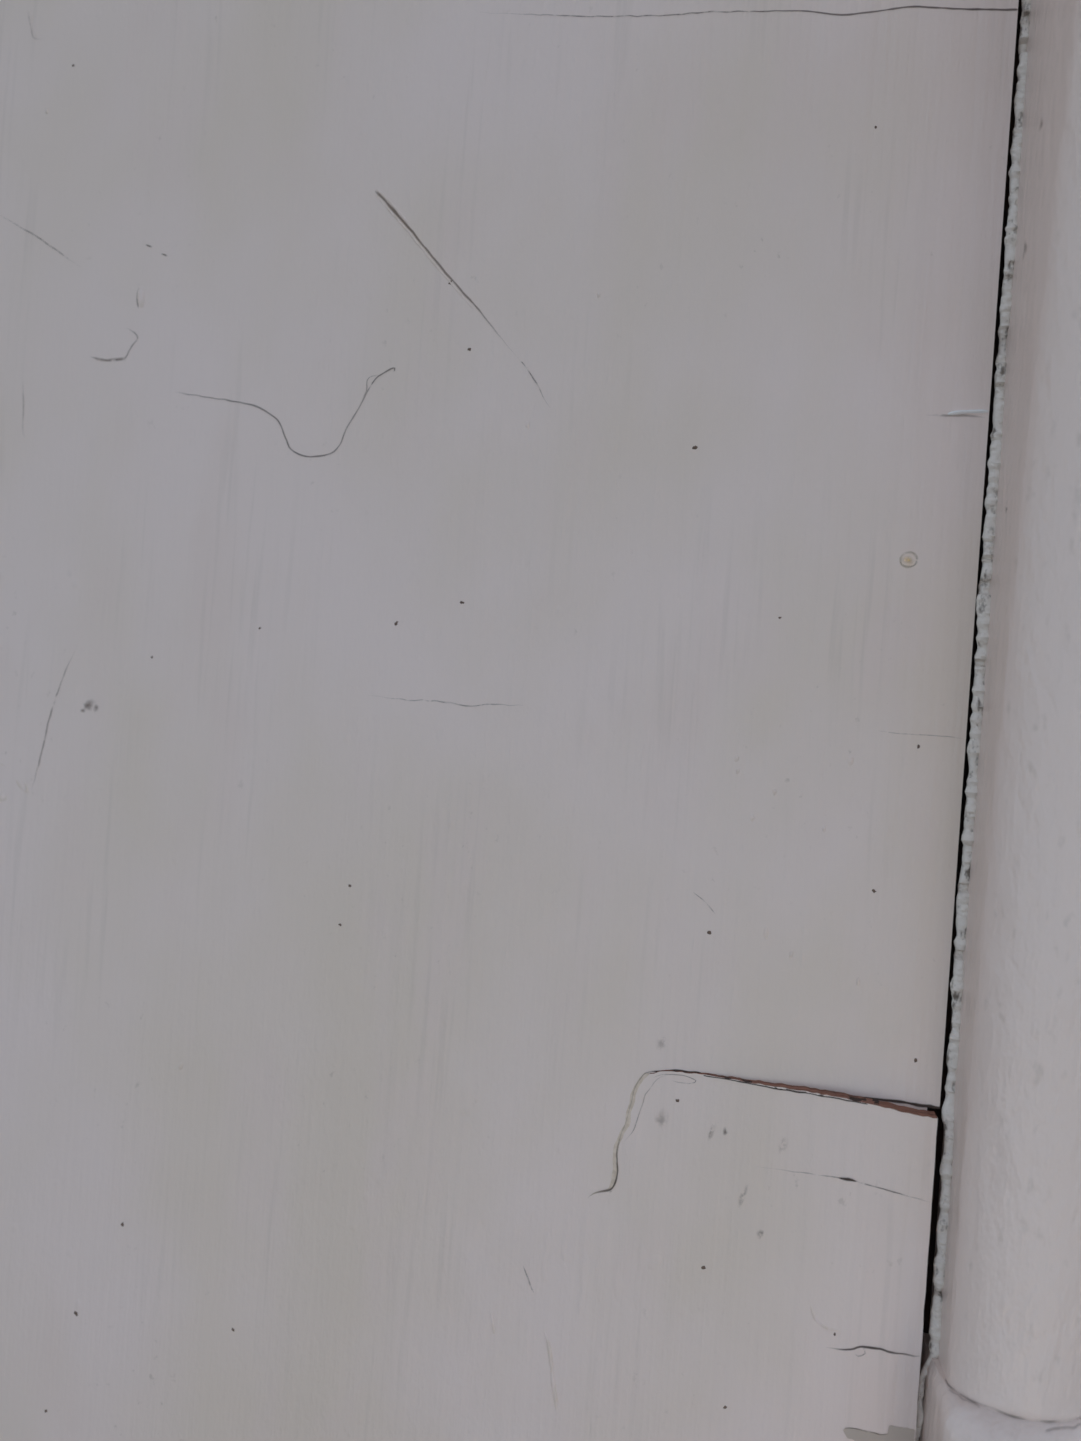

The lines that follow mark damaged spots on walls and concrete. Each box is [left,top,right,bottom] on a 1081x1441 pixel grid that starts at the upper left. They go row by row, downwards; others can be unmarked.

crack [565,6,1017,17]
crack [261,408,333,457]